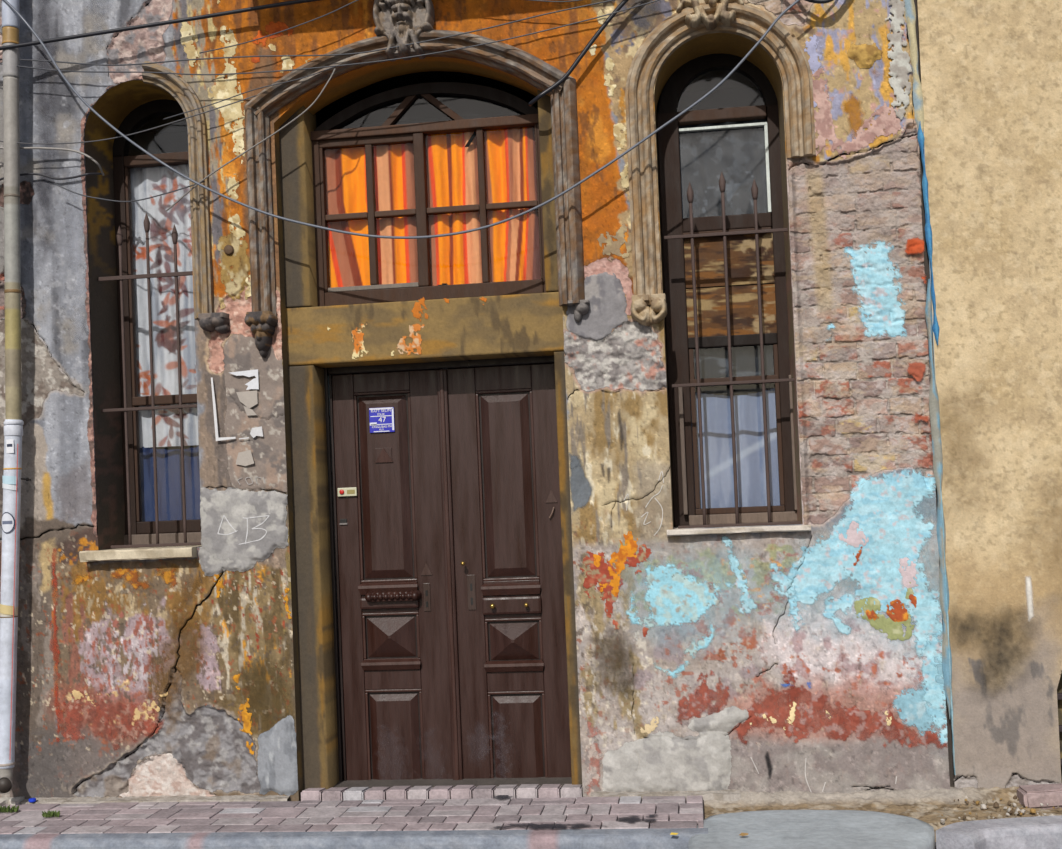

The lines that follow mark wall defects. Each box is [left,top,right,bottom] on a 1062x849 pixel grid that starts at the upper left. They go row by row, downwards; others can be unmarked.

peeling [207,26,245,165]
crack [789,72,917,170]
spalling [20,0,200,537]
spalling [207,214,255,374]
spalling [272,290,282,360]
spalling [564,224,667,392]
spalling [734,0,948,748]
crack [0,524,93,540]
crack [73,571,223,794]
spalling [49,549,261,798]
peeling [580,531,757,637]
damp [959,620,1018,684]